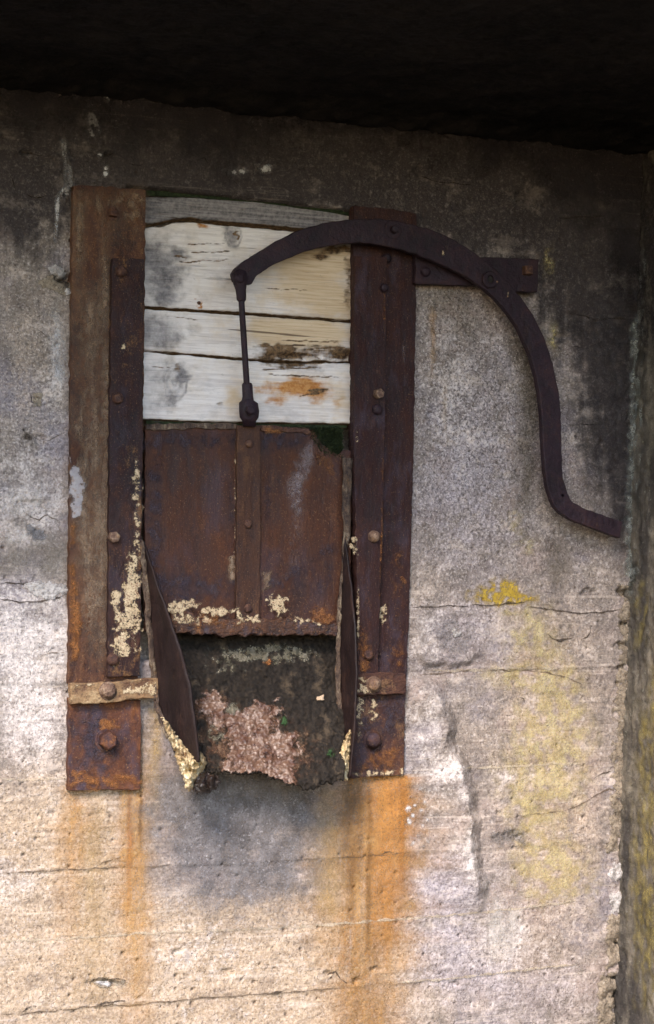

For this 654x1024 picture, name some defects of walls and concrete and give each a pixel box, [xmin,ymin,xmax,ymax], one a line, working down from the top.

crack [413,600,619,642]
peeling [195,689,302,785]
corrosion [120,728,159,976]
water stain [143,770,318,910]
corrosion [326,776,410,1024]